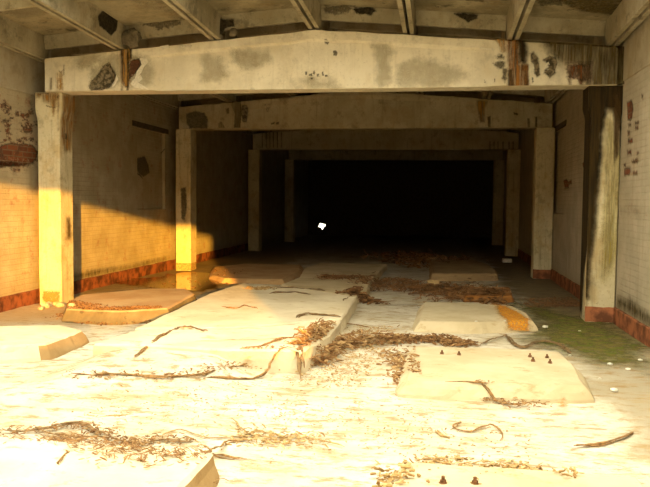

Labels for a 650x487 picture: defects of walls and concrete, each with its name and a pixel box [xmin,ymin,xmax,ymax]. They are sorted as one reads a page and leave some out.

spalling [98,11,142,49]
peeling [454,13,478,22]
spalling [89,63,118,90]
corrosion [121,49,132,91]
corrosion [497,39,529,86]
spalling [531,52,557,77]
peeling [0,101,38,171]
peeling [624,100,639,175]
water stain [545,42,624,312]